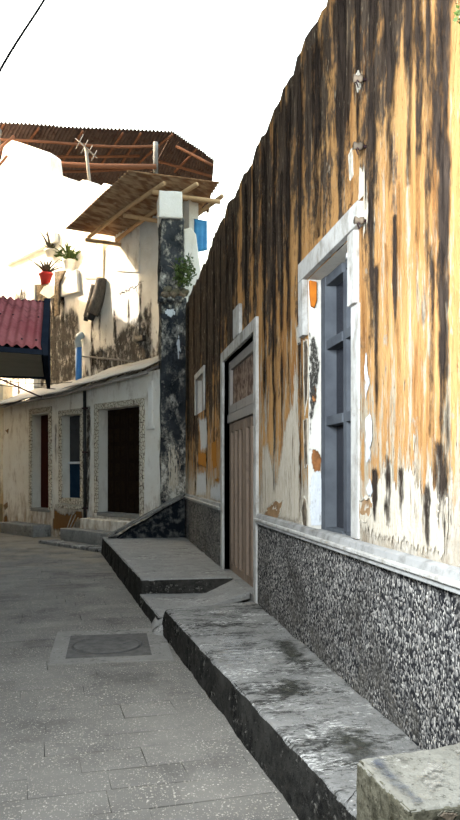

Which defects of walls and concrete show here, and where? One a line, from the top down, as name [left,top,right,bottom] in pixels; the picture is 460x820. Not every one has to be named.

water stain [43,297,79,383]
water stain [91,284,151,372]
water stain [168,35,323,462]
peeling [262,325,321,526]
water stain [335,0,451,545]